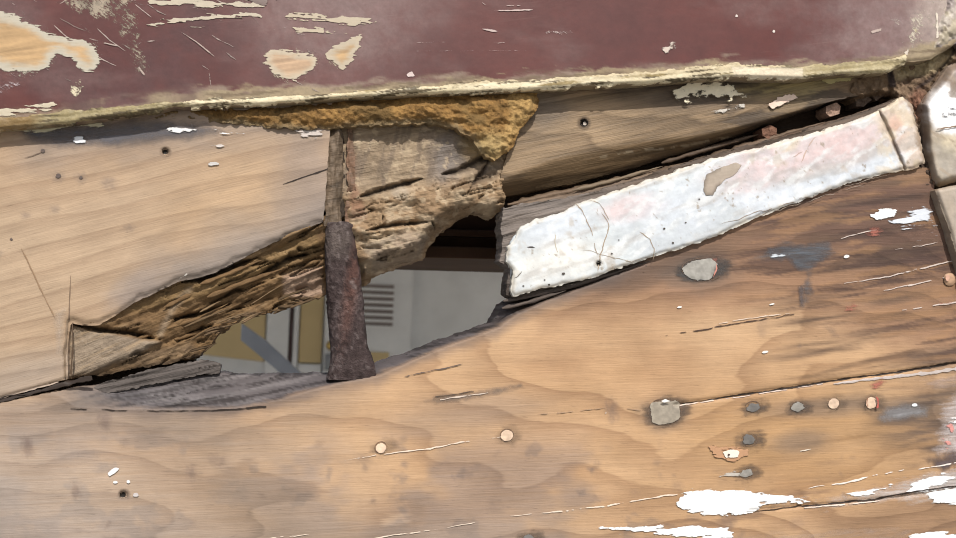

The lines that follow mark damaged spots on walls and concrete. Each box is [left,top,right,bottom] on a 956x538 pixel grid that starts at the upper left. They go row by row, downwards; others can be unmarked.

peeling [146,0,267,28]
peeling [0,11,102,76]
peeling [263,12,376,83]
peeling [0,102,57,116]
peeling [673,82,746,113]
peeling [769,94,798,109]
peeling [294,130,323,139]
corrosion [324,221,376,380]
crack [680,362,956,407]